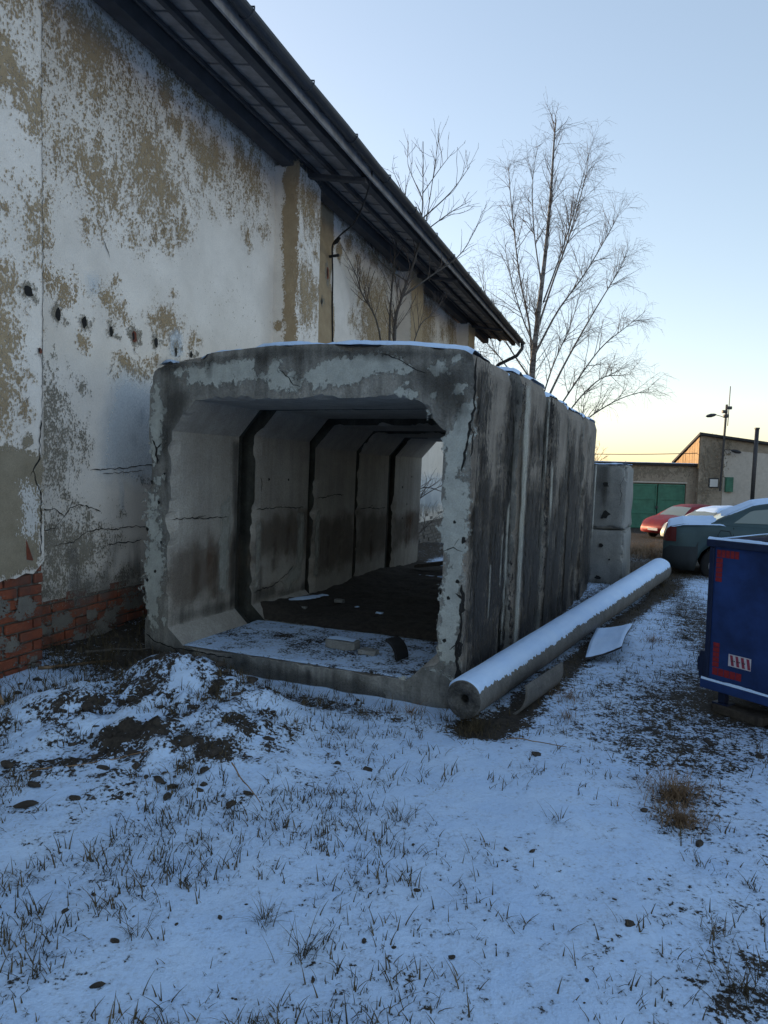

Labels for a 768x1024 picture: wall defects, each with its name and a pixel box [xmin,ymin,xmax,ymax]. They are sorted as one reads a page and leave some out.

crack [25,133,145,554]
peeling [0,0,611,681]
crack [173,513,227,521]
water stain [219,500,230,590]
crack [442,358,482,679]
water stain [490,388,530,643]